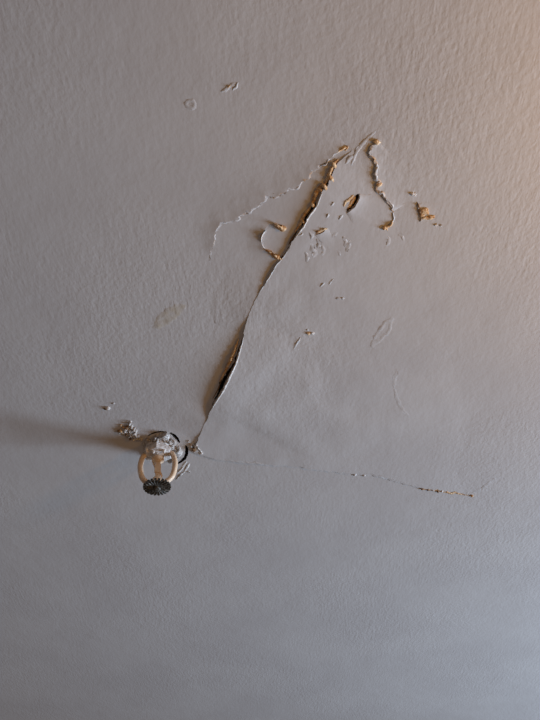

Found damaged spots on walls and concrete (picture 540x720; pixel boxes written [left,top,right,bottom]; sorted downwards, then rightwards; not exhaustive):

peeling [193,134,349,261]
peeling [339,140,444,231]
peeling [246,222,287,272]
crack [148,131,376,466]
spalling [117,421,143,442]
crack [332,471,496,497]